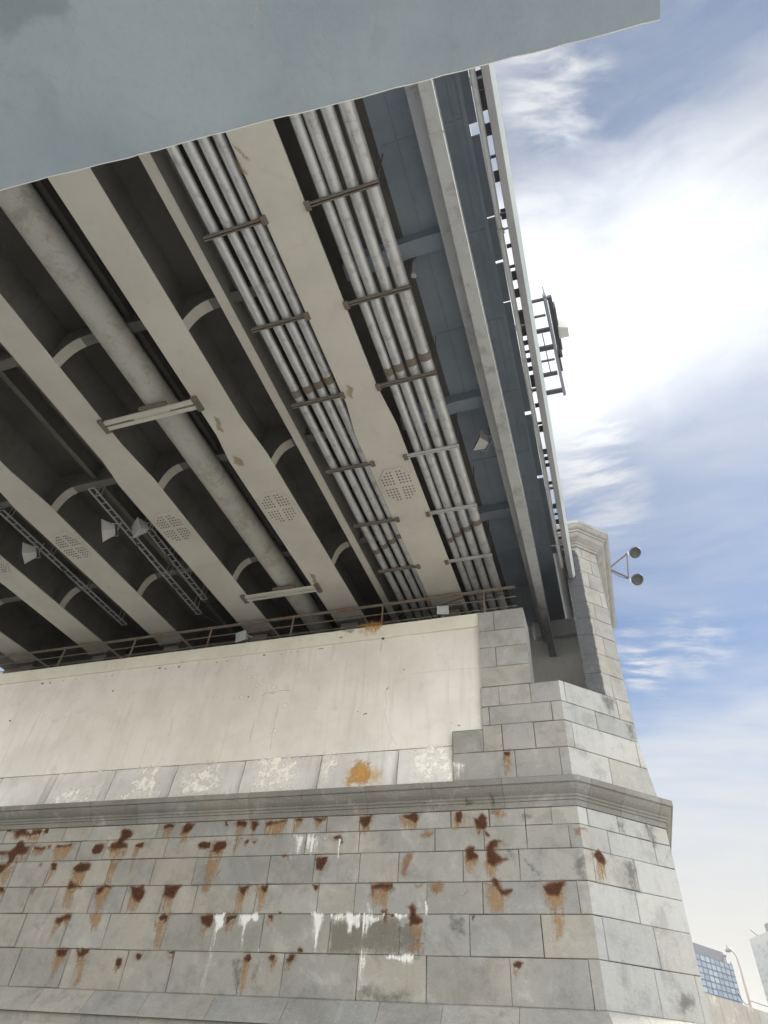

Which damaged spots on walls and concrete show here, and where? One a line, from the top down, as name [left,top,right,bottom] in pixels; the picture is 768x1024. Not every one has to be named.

rust [347,762,378,786]
rust [0,828,71,894]
rust [55,829,144,930]
rust [156,885,182,945]
efflorescence [210,912,226,959]
efflorescence [239,913,259,945]
rust [199,818,325,892]
damp [312,909,414,975]
rust [455,810,513,909]
rust [543,880,565,928]
rust [594,850,605,876]